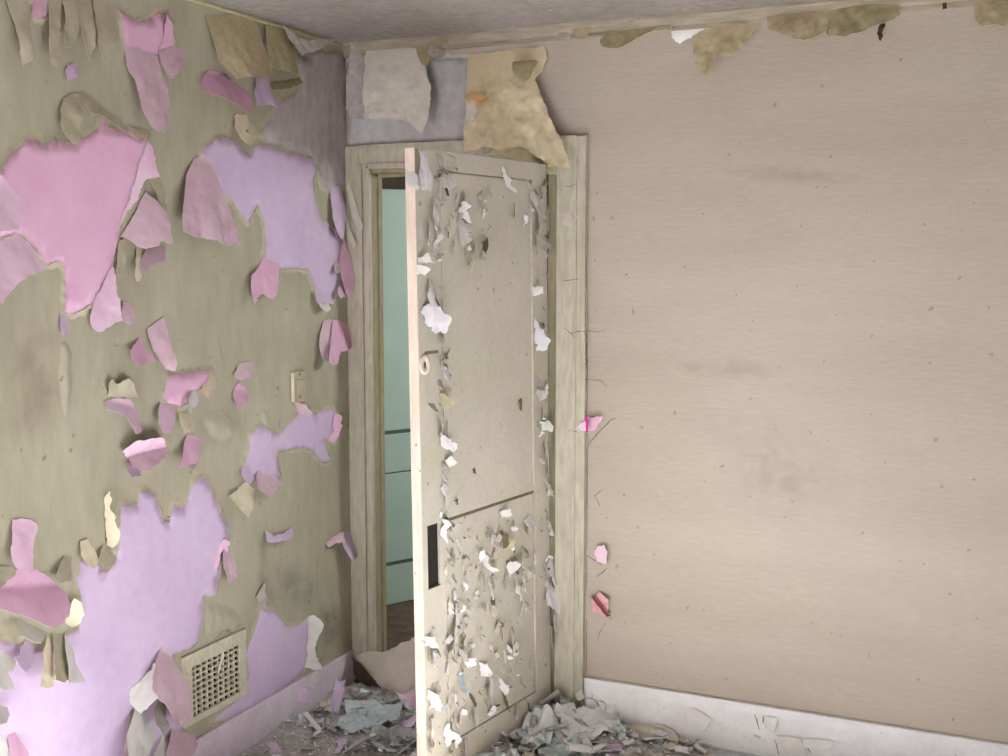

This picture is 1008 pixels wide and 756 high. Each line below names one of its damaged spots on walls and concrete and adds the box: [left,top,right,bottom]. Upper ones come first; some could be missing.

peeling [119,11,173,56]
peeling [0,117,148,315]
peeling [162,369,214,407]
peeling [202,46,559,756]
peeling [0,477,230,756]